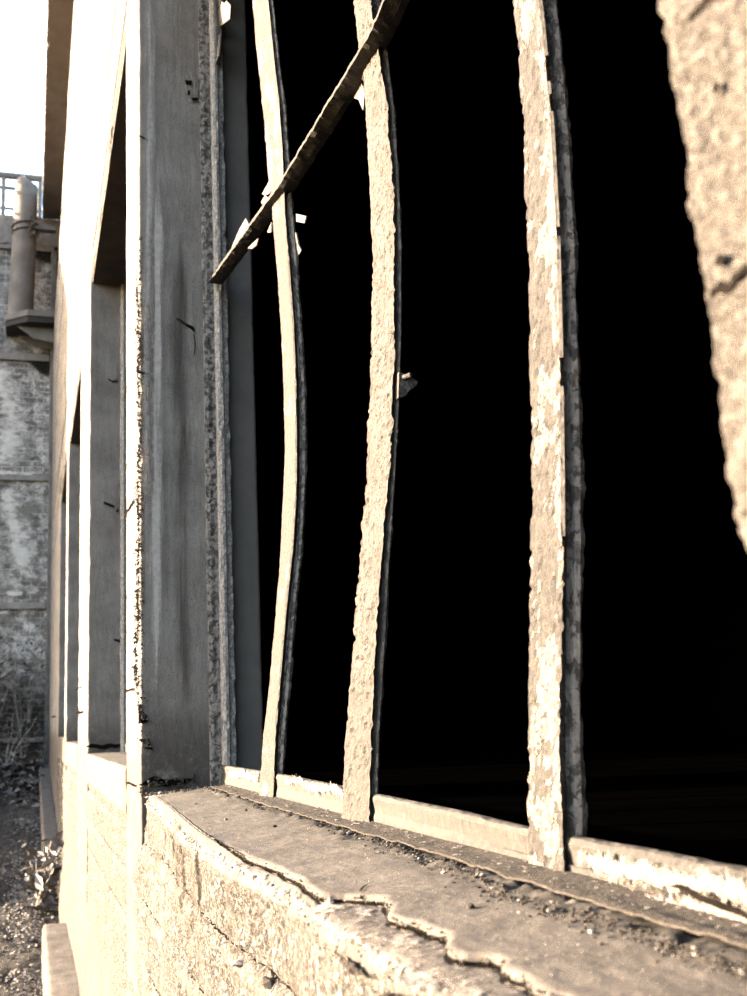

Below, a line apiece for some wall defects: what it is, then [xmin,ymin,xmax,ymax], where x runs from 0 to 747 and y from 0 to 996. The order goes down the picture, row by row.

crack [689,0,711,23]
crack [709,265,747,298]
crack [214,839,555,996]